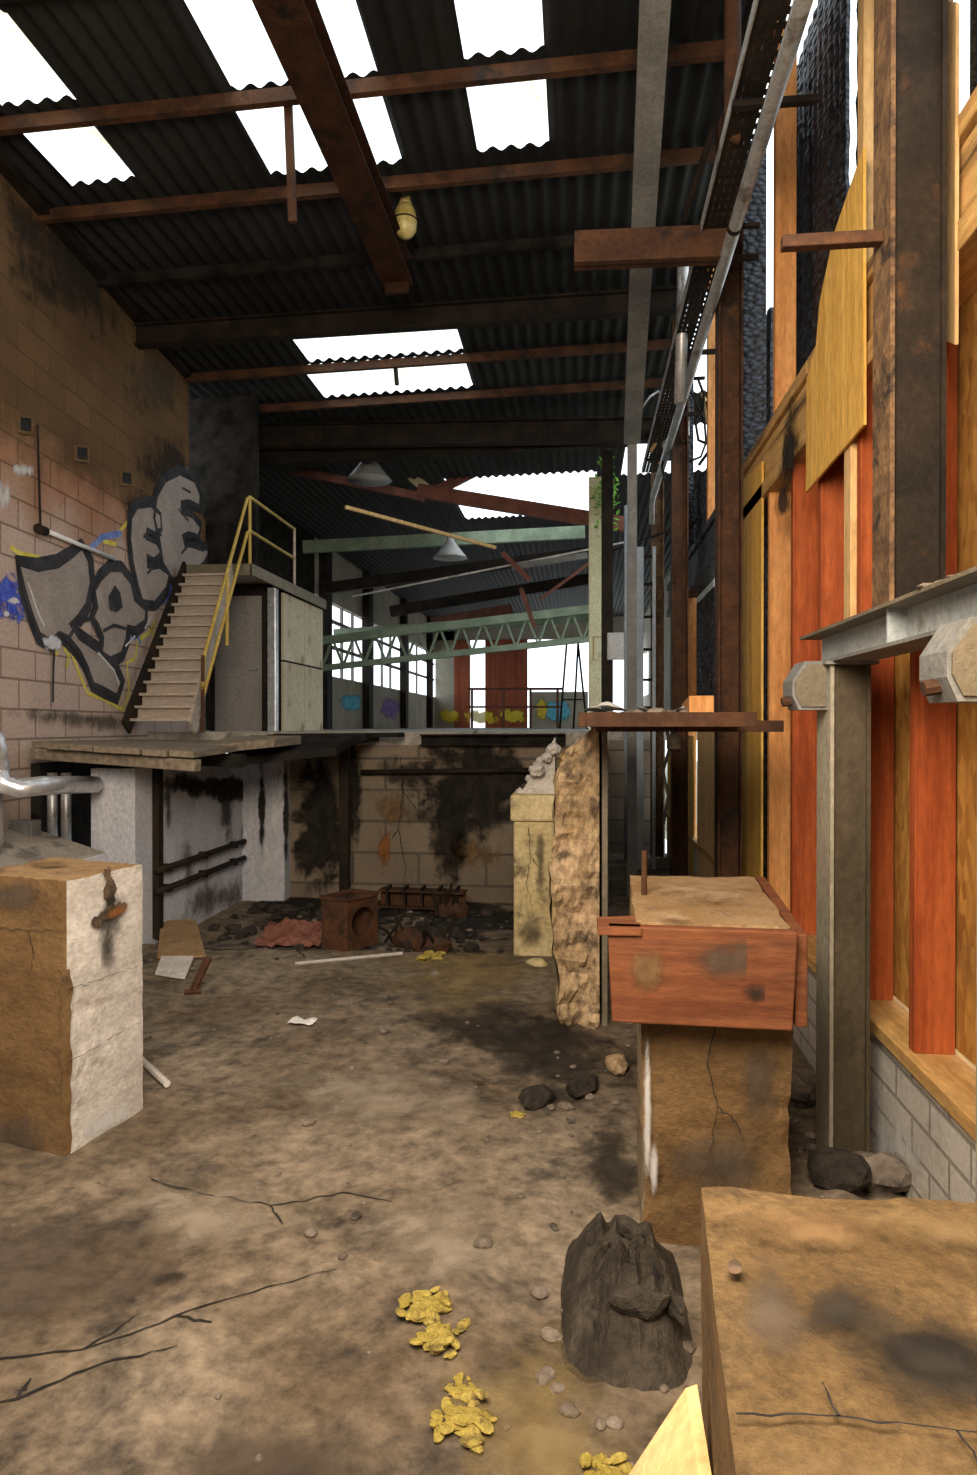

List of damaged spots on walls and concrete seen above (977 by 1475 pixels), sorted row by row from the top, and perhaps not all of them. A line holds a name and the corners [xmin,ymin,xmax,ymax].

leakage [194,887,240,911]
crack [151,1178,392,1224]
crack [0,1269,334,1403]